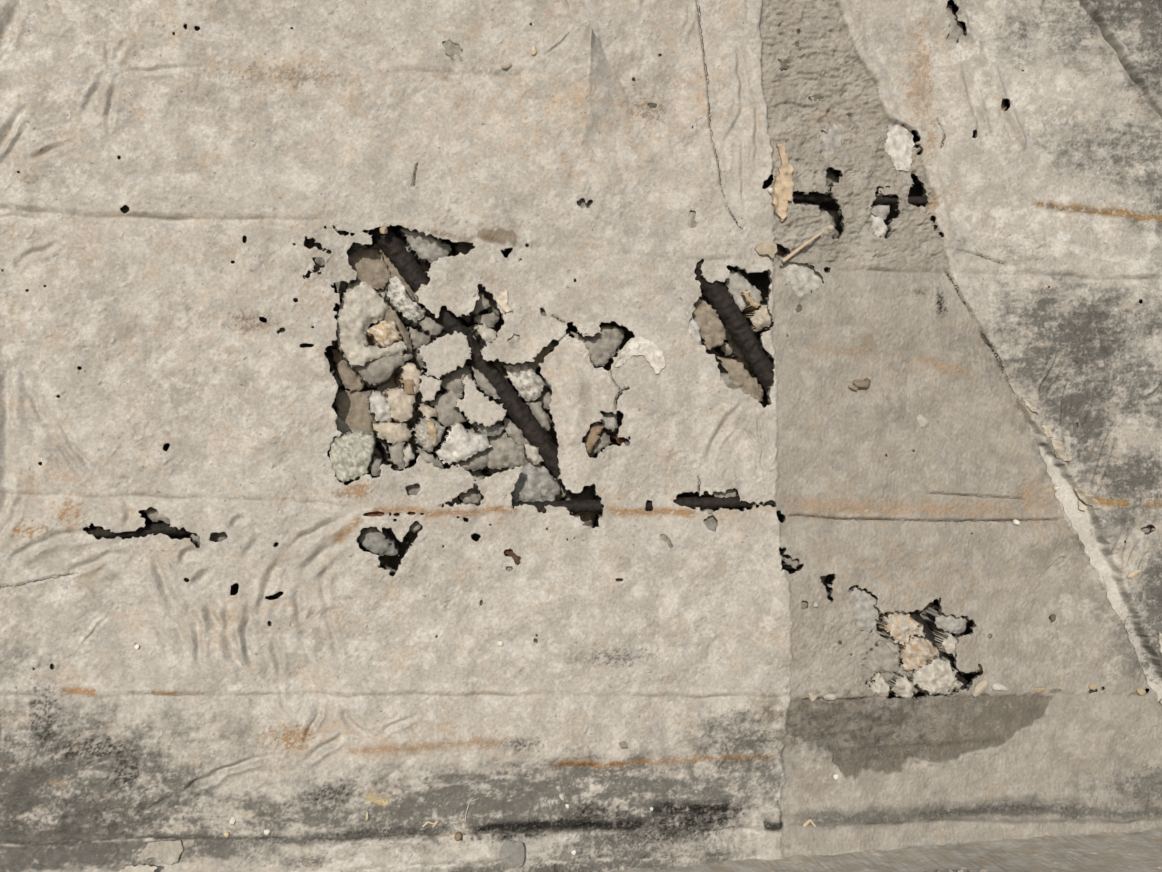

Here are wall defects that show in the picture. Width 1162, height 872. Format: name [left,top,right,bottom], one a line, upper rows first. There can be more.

crack [696,0,743,229]
spalling [884,124,915,172]
spalling [871,186,944,238]
corrosion [1037,202,1162,220]
spalling [688,242,824,408]
crack [944,250,1015,394]
spalling [327,225,666,527]
spalling [83,507,214,548]
spalling [673,489,776,532]
crack [785,493,1056,522]
spalling [847,585,983,700]
leakage [763,693,1048,778]